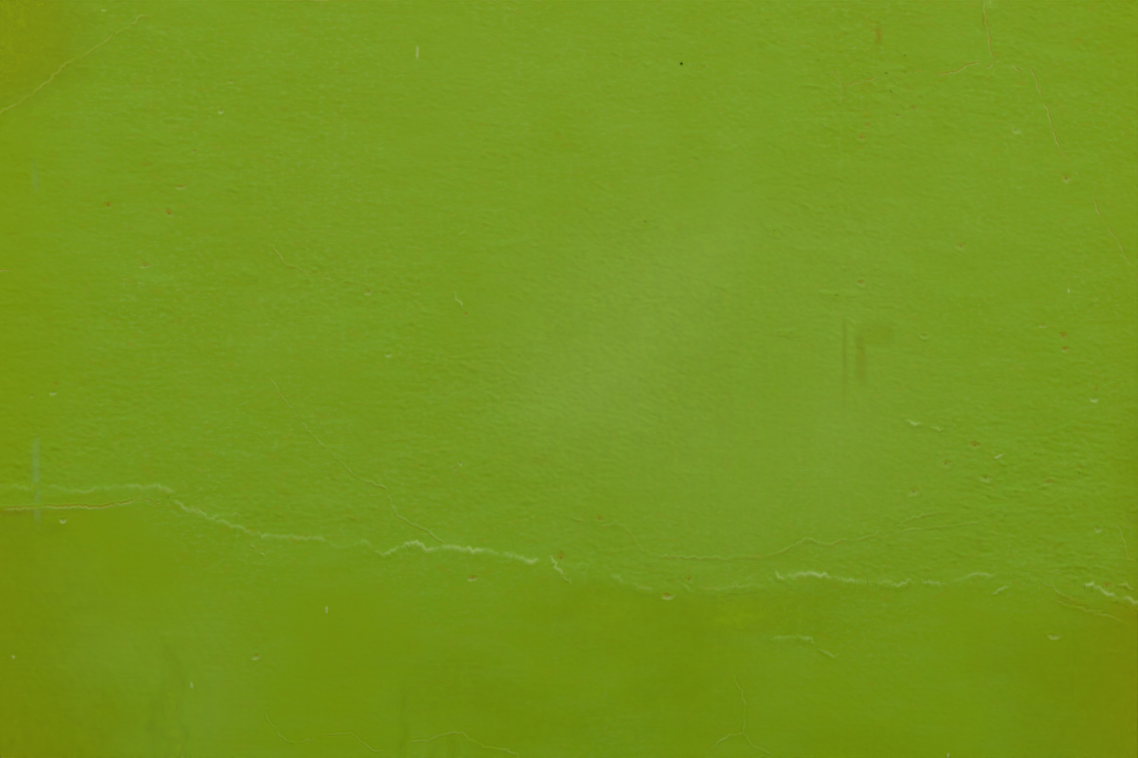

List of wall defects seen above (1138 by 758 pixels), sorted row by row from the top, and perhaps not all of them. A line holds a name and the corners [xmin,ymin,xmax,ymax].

spalling [373,539,572,585]
spalling [772,568,1010,597]
spalling [1082,581,1138,612]